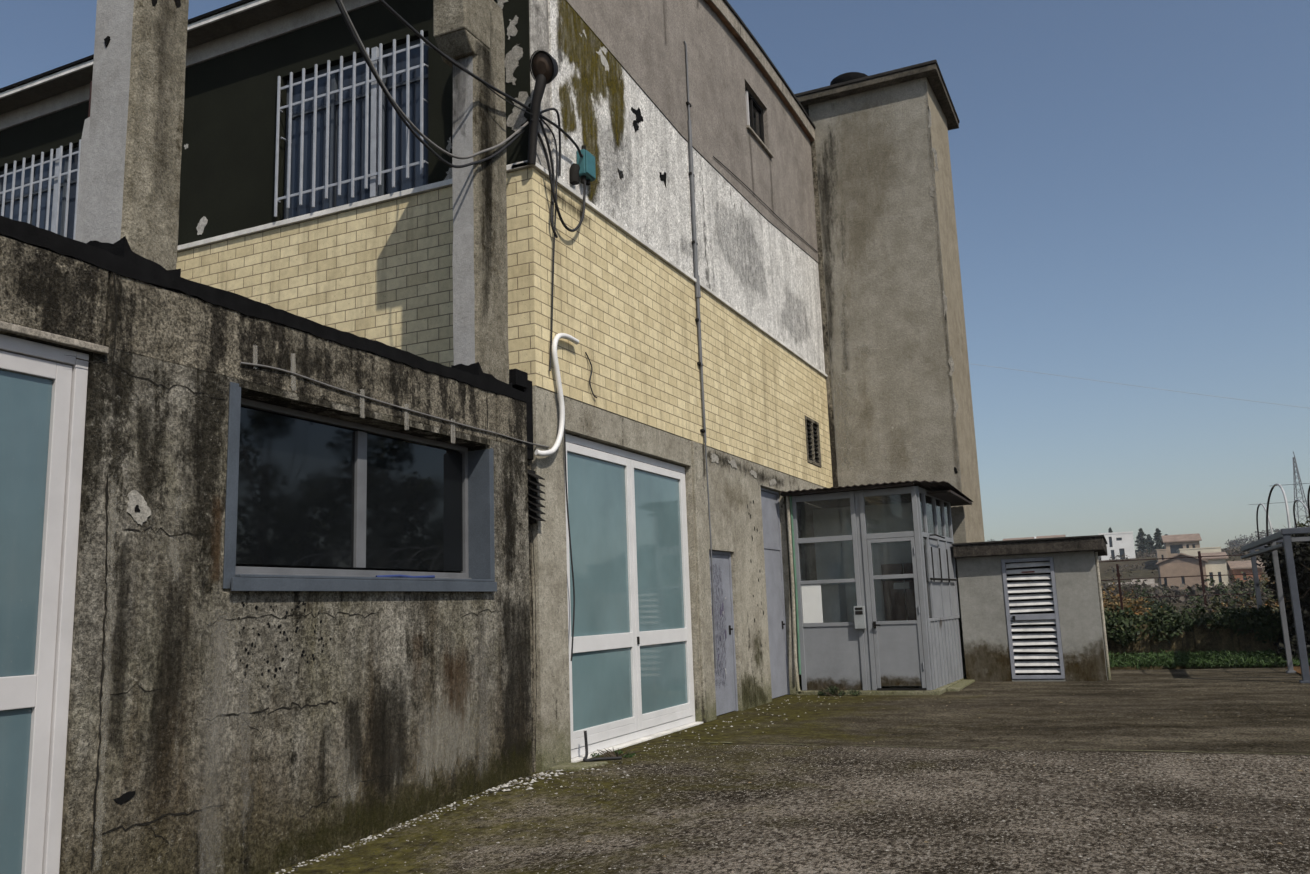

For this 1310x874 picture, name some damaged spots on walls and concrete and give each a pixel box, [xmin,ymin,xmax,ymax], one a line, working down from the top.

peeling [497,0,531,134]
water stain [549,72,625,217]
spalling [631,107,644,132]
water stain [7,265,152,433]
water stain [253,332,400,415]
water stain [818,133,868,464]
spalling [126,490,151,526]
water stain [111,546,129,738]
water stain [498,480,531,769]
water stain [321,678,482,799]